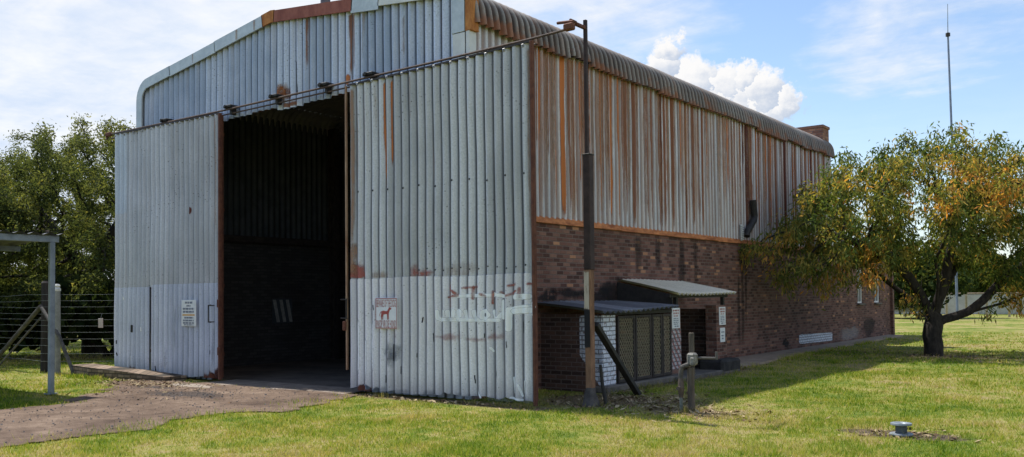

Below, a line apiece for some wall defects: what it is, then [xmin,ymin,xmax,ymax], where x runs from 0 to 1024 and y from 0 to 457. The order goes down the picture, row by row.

corrosion [346,15,365,278]
corrosion [383,81,393,179]
corrosion [528,46,825,232]